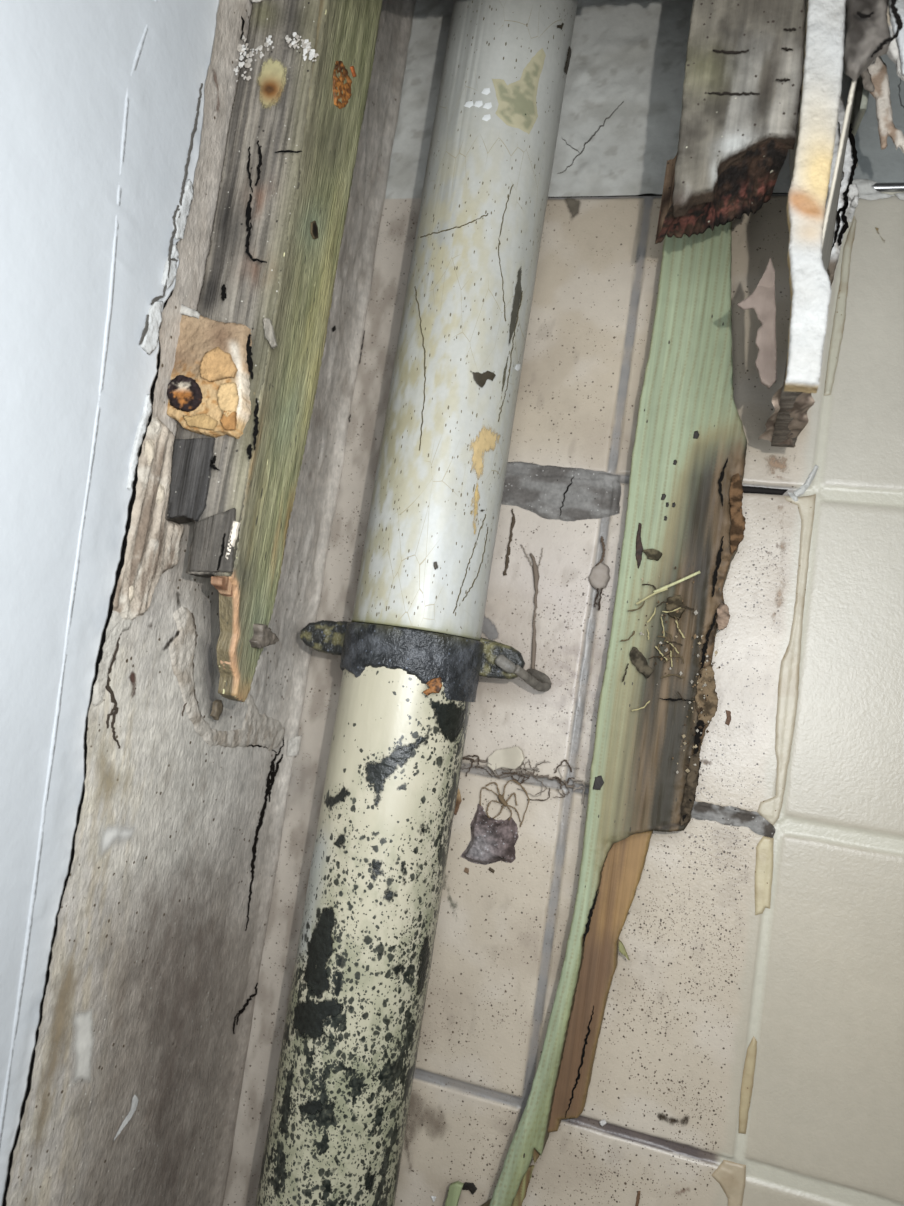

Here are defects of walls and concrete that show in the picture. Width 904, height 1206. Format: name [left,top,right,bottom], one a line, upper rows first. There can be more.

peeling [464,48,546,134]
peeling [861,0,904,153]
peeling [825,97,859,285]
peeling [263,318,278,349]
peeling [92,417,240,707]
crack [2,83,203,1206]
spalling [169,606,302,756]
crack [245,736,284,931]
peeling [487,746,525,771]
crack [233,983,258,1034]